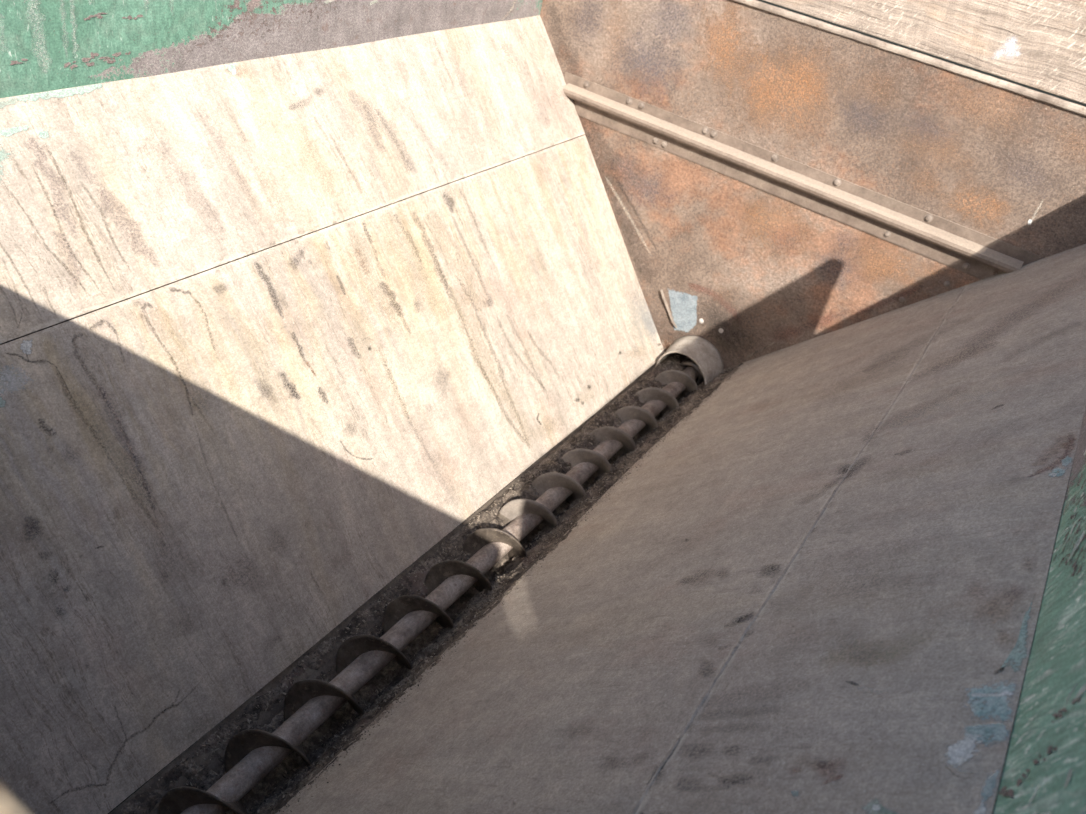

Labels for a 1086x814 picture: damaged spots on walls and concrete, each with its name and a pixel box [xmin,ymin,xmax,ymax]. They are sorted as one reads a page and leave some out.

peeling [16,0,543,102]
damp [256,263,282,315]
peeling [945,603,1032,777]
peeling [972,746,1057,814]